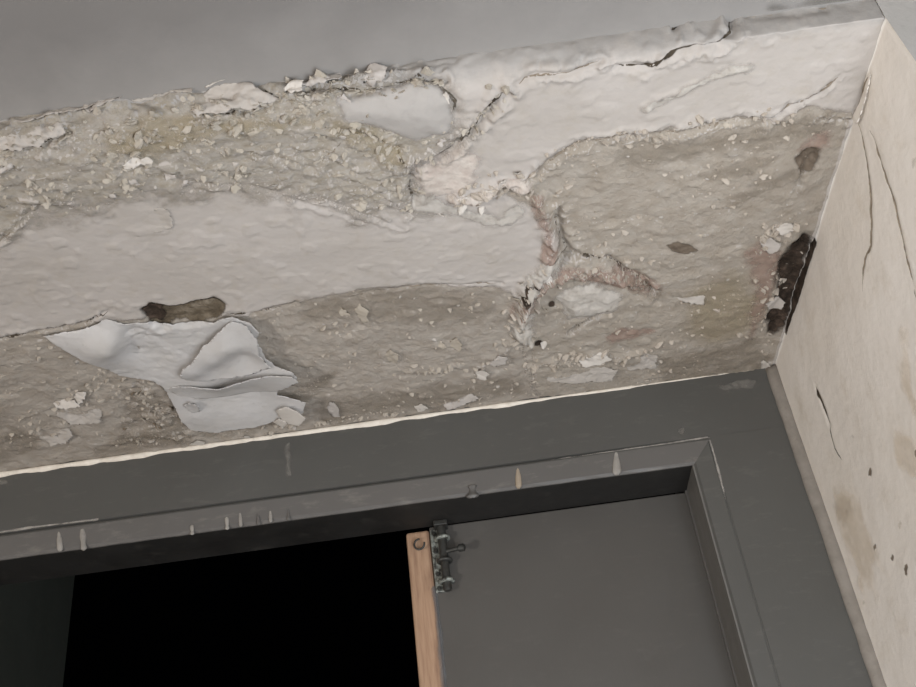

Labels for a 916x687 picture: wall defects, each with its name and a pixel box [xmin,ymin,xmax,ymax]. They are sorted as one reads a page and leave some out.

crack [784,77,838,109]
crack [549,133,628,161]
crack [827,72,916,296]
peeling [0,63,853,472]
crack [555,221,651,286]
crack [816,387,841,458]